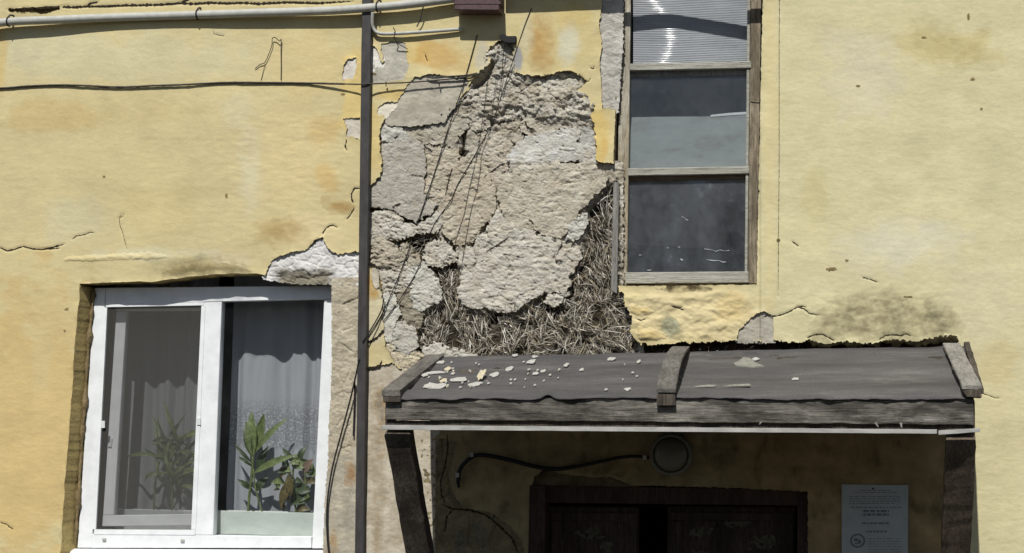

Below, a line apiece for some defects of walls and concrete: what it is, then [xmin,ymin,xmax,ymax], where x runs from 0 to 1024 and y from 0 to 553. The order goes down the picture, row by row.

crack [1,232,93,251]
flaking render [262,0,958,553]
crack [763,305,834,341]